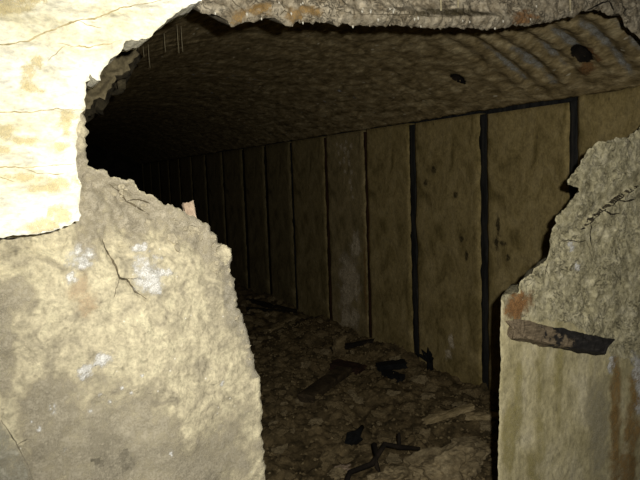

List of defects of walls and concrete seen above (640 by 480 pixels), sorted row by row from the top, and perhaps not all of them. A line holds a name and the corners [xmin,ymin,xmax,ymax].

crack [0,0,161,60]
damp [66,246,93,282]
crack [101,238,146,299]
damp [133,242,172,294]
spalling [76,152,259,378]
corrosion [505,291,532,319]
spalling [504,130,640,367]
crack [560,184,638,261]
damp [20,354,250,480]
corrosion [611,358,640,480]